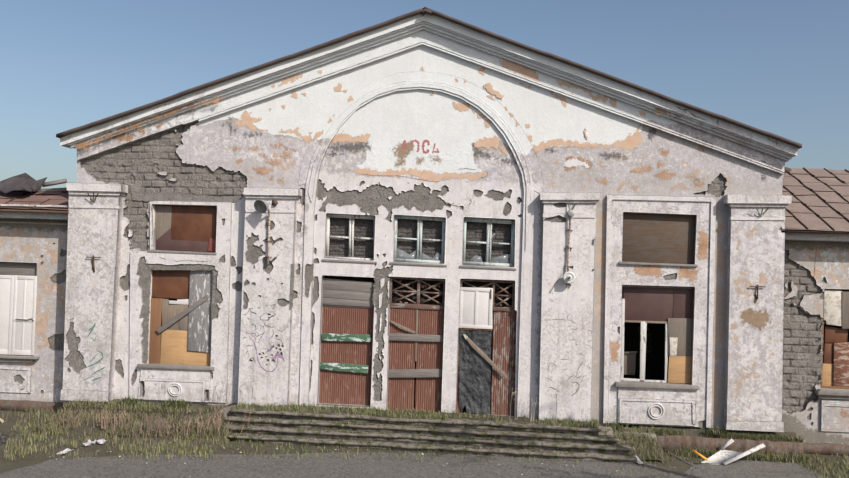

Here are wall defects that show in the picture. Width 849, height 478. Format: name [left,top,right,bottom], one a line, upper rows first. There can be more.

peeling [496,60,539,89]
peeling [478,67,646,168]
spalling [315,142,522,222]
spalling [693,174,727,197]
spalling [51,270,66,284]
spalling [49,318,86,372]
spalling [81,121,283,396]
spalling [278,248,319,345]
spalling [370,253,393,401]
spalling [782,250,827,425]